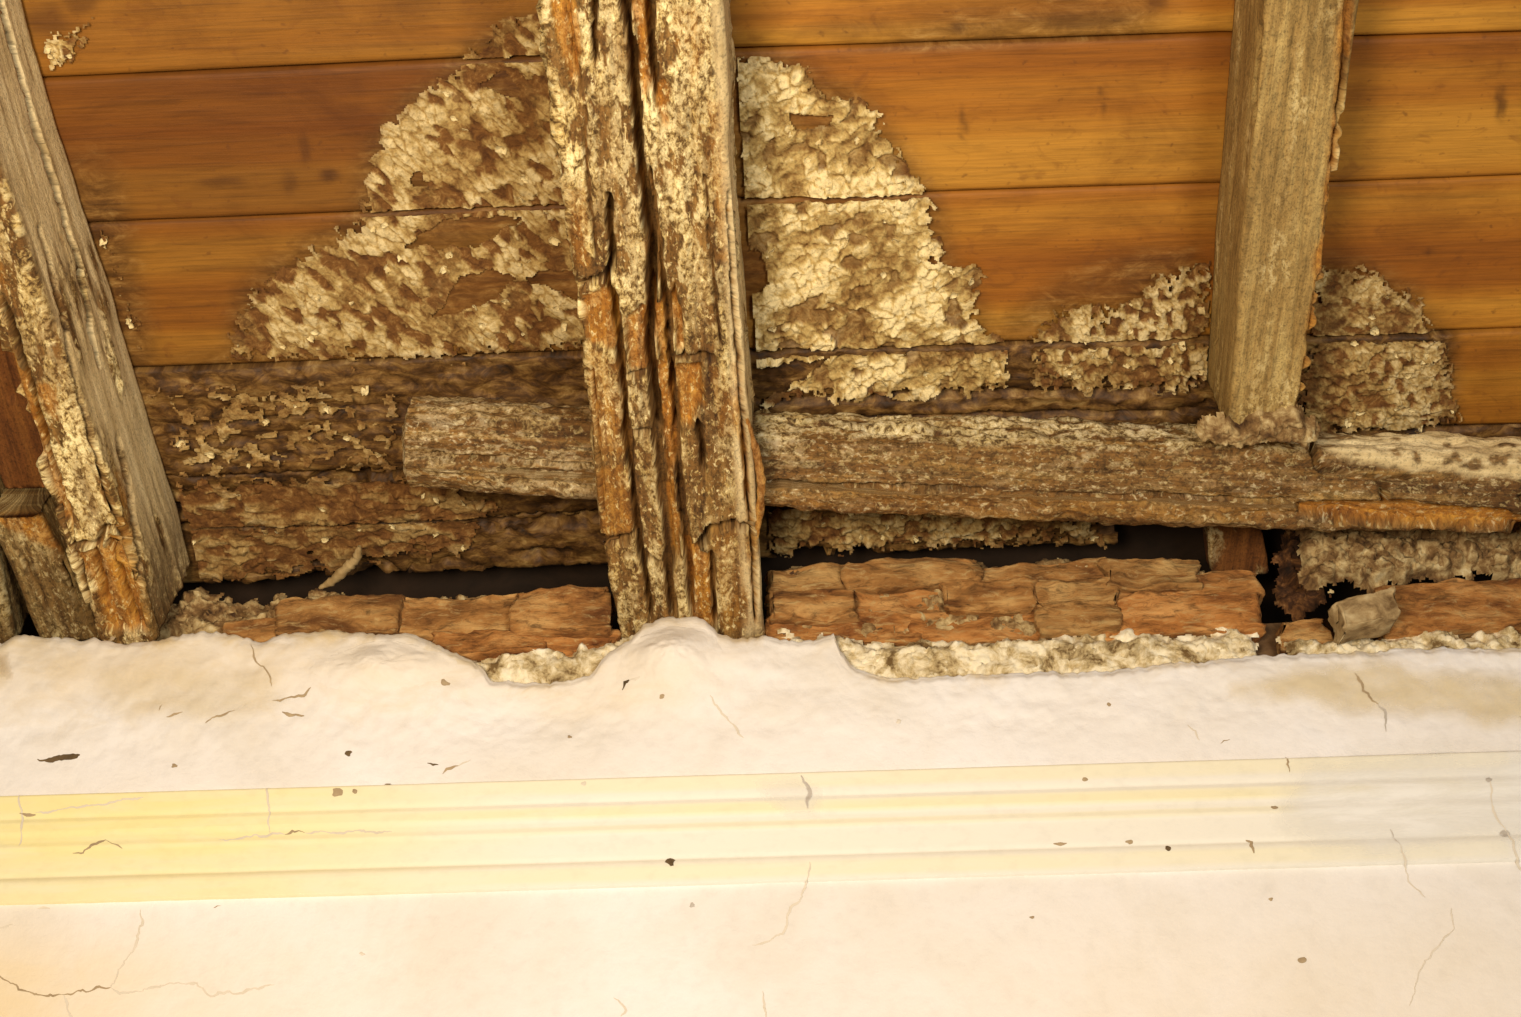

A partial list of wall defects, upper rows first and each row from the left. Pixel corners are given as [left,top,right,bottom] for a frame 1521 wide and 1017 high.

spalling [764,508,1521,680]
damp [1277,671,1521,716]
crack [1490,781,1521,870]
crack [0,909,272,1017]